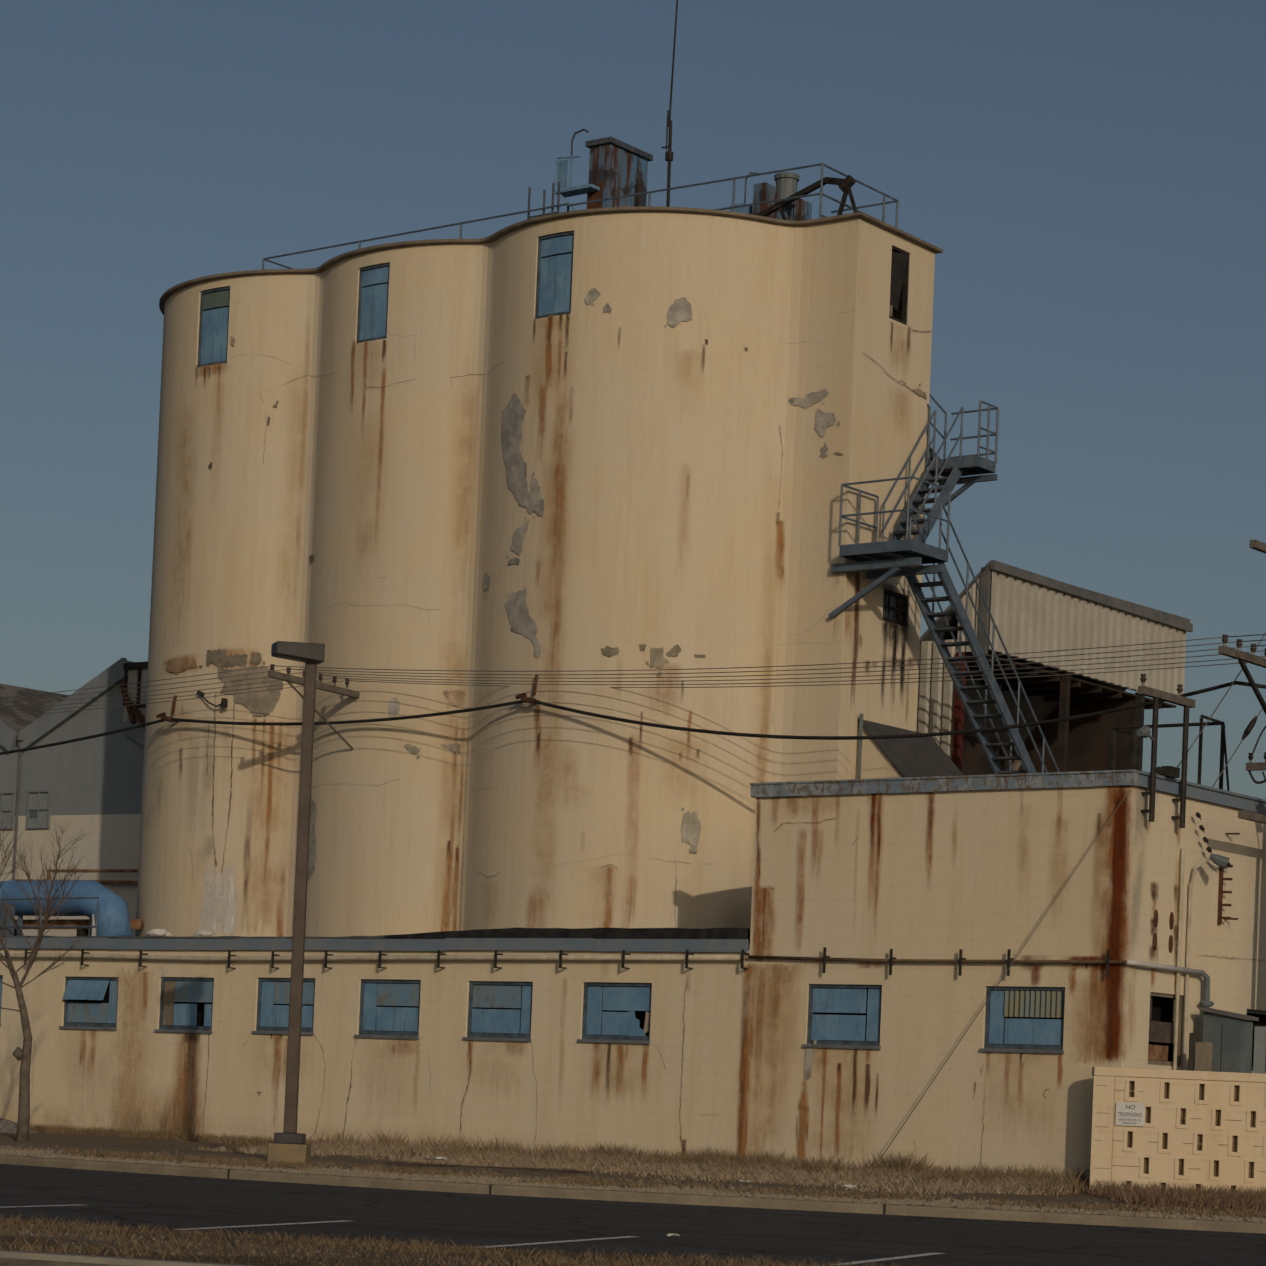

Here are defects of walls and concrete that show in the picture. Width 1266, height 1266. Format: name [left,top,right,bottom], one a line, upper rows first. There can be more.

spalling [664,297,692,328]
spalling [501,393,544,565]
rust [533,312,569,433]
spalling [788,388,843,458]
spalling [505,586,541,657]
spalling [165,649,283,717]
spalling [681,807,701,854]
rust [871,794,881,855]
rust [744,848,771,984]
rust [1071,786,1129,1059]
rust [738,1017,753,1159]
rust [796,1048,878,1161]